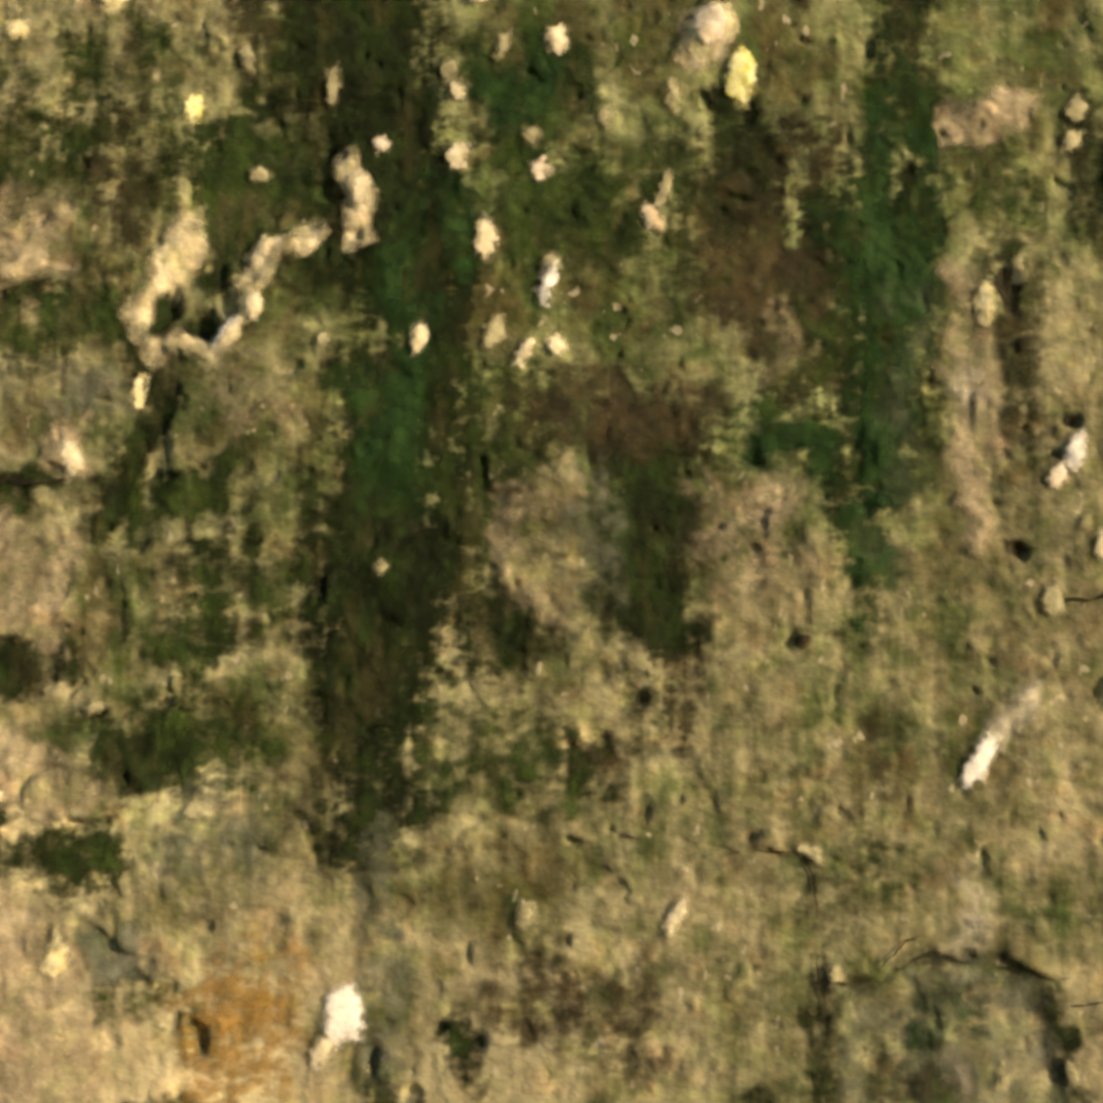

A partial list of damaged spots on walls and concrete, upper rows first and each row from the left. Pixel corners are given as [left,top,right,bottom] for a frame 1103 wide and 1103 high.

flaking render [239,45,255,73]
flaking render [327,67,339,104]
peeling [936,87,1039,146]
spalling [123,88,376,364]
flaking render [132,377,144,408]
peeling [941,266,1003,548]
water stain [82,0,956,990]
water stain [808,965,833,995]
water stain [436,936,666,1085]
water stain [797,1008,832,1048]